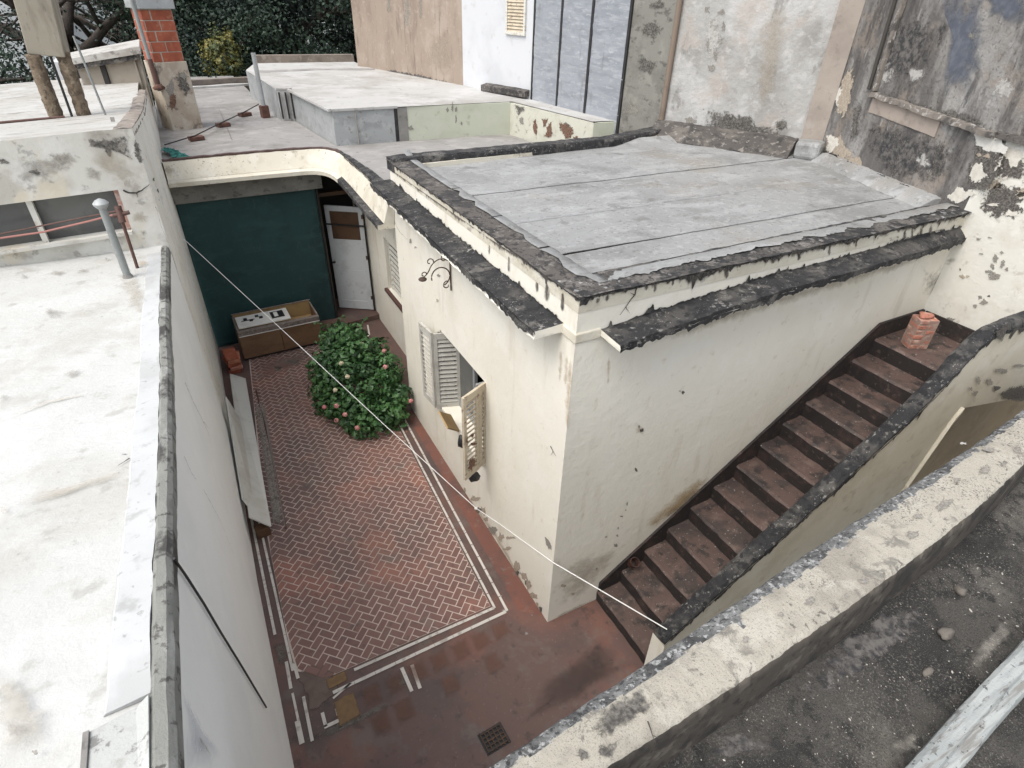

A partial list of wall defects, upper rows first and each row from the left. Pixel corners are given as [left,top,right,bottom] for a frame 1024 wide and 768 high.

leakage [878,0,978,97]
peeling [835,67,854,118]
leakage [991,79,1013,97]
leakage [89,137,142,163]
peeling [519,117,578,140]
peeling [826,133,862,165]
leakage [851,104,959,181]
leakage [905,100,984,126]
peeling [947,134,1024,219]
peeling [979,251,1008,280]
peeling [464,488,515,550]
leakage [654,484,700,523]